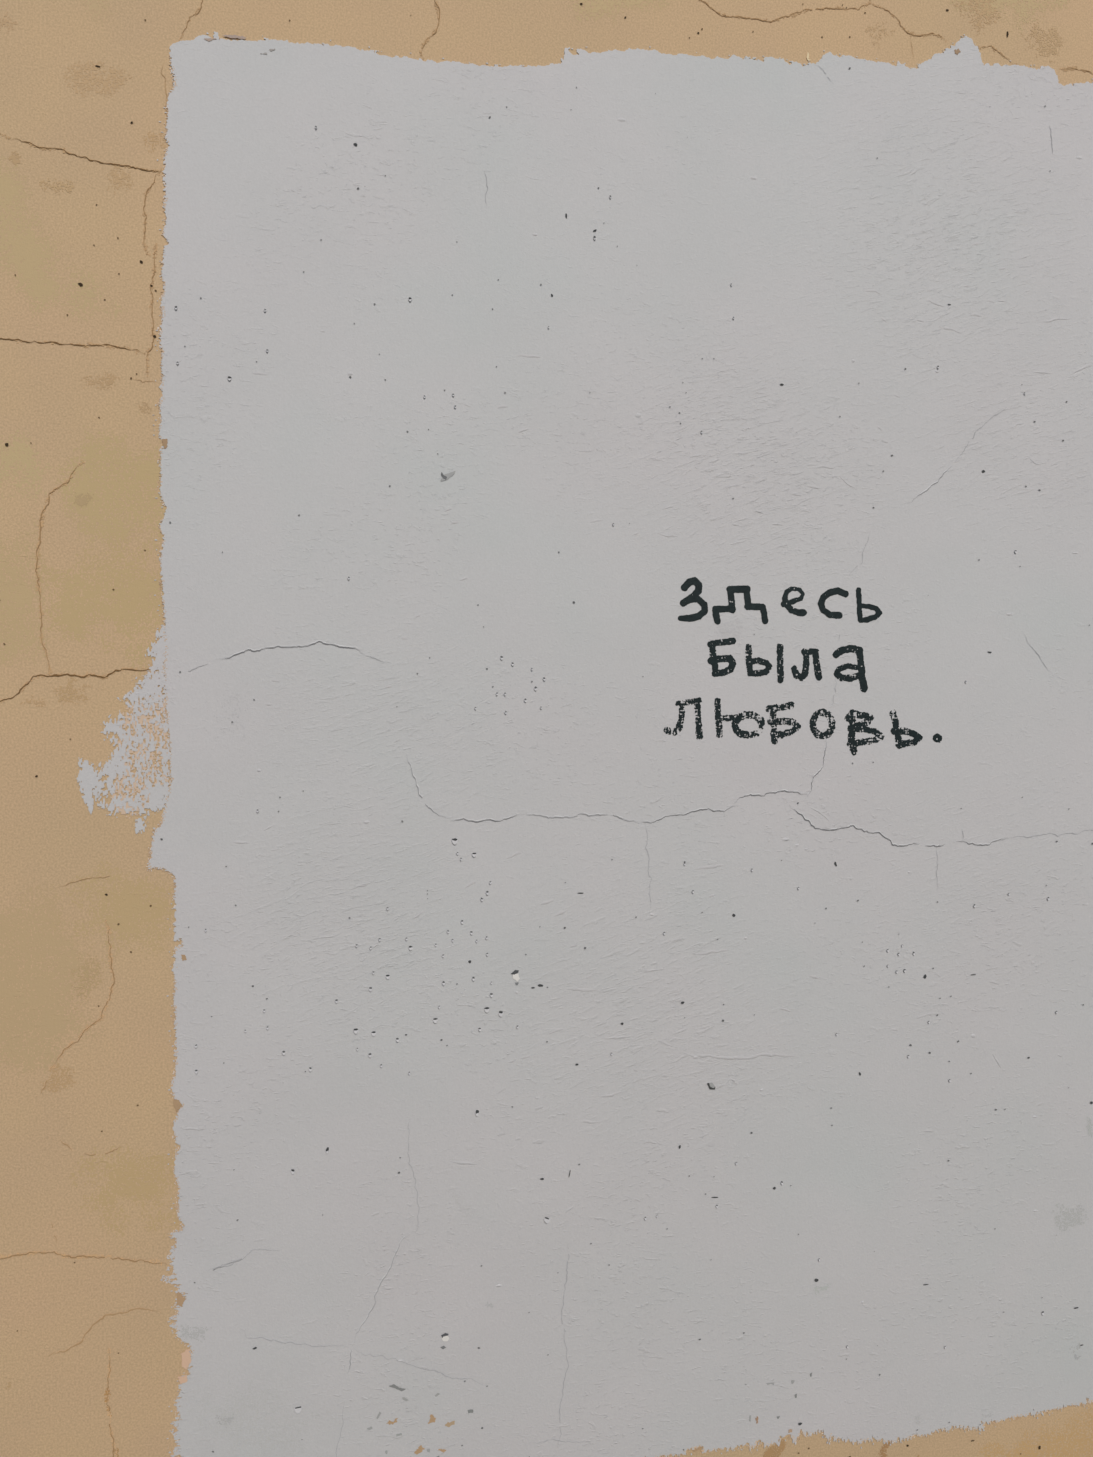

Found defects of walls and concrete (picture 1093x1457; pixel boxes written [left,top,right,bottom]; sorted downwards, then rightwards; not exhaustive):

crack [419,0,440,59]
crack [701,0,1019,65]
crack [1060,66,1093,74]
crack [0,133,163,382]
crack [1,460,151,703]
crack [190,640,383,671]
crack [407,741,1093,909]
crack [41,919,115,1093]
crack [0,1225,168,1266]
crack [49,1308,152,1457]